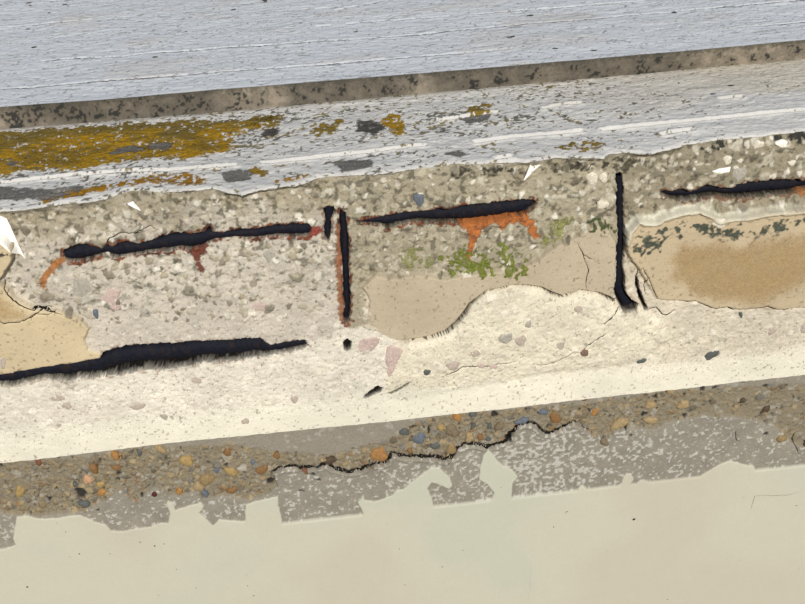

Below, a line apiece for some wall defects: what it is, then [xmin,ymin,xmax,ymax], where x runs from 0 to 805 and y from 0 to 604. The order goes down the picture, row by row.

peeling [356,120,385,136]
peeling [461,114,491,124]
crack [104,225,158,247]
corrosion [457,211,540,260]
corrosion [335,224,344,321]
spalling [0,131,805,451]
crack [635,268,799,315]
spalling [0,300,805,548]
crack [272,420,590,479]